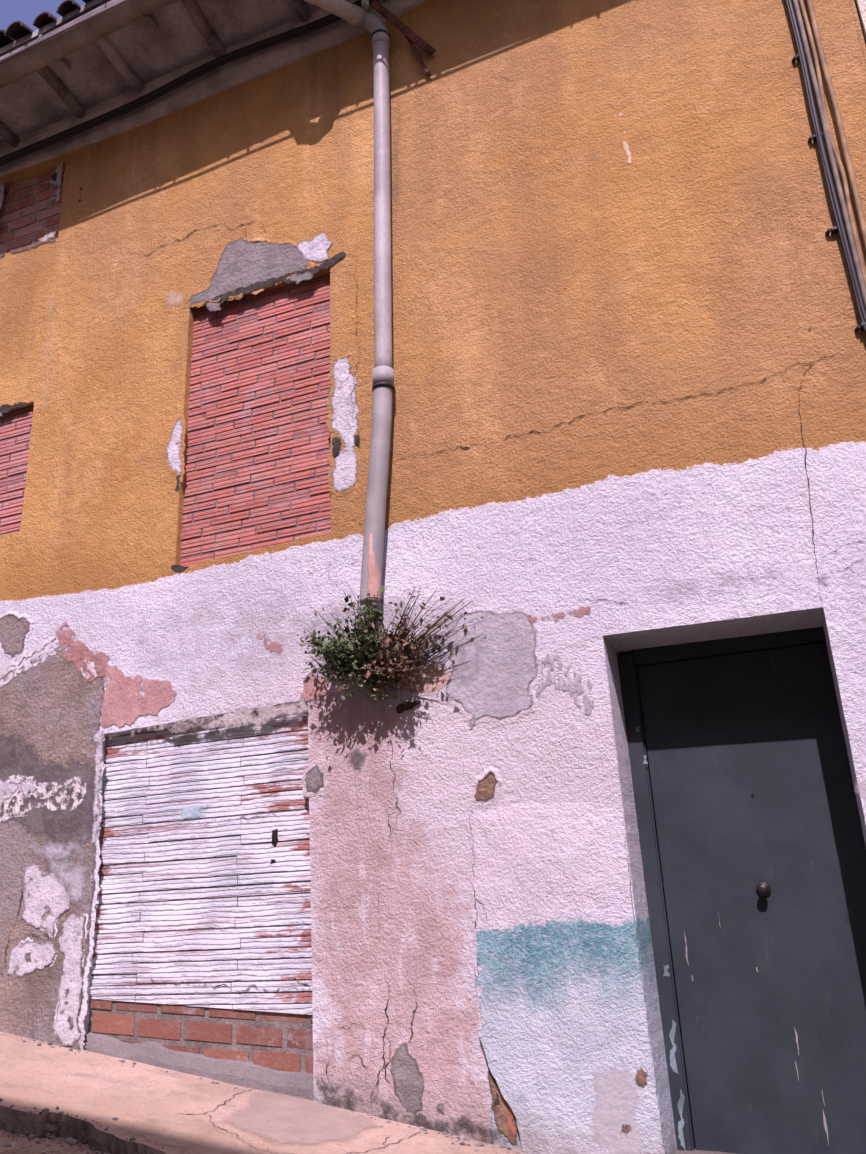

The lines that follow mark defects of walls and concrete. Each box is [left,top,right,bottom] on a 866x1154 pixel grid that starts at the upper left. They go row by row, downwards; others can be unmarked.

crack [131,220,265,256]
flaking render [168,233,346,311]
peeling [326,352,363,497]
crack [391,354,865,601]
spalling [395,605,594,726]
flaking render [470,766,503,808]
flaking render [0,610,330,1051]
crack [326,982,418,1107]
crack [164,1089,296,1154]
crack [345,1129,421,1154]
flaking render [488,1070,518,1144]